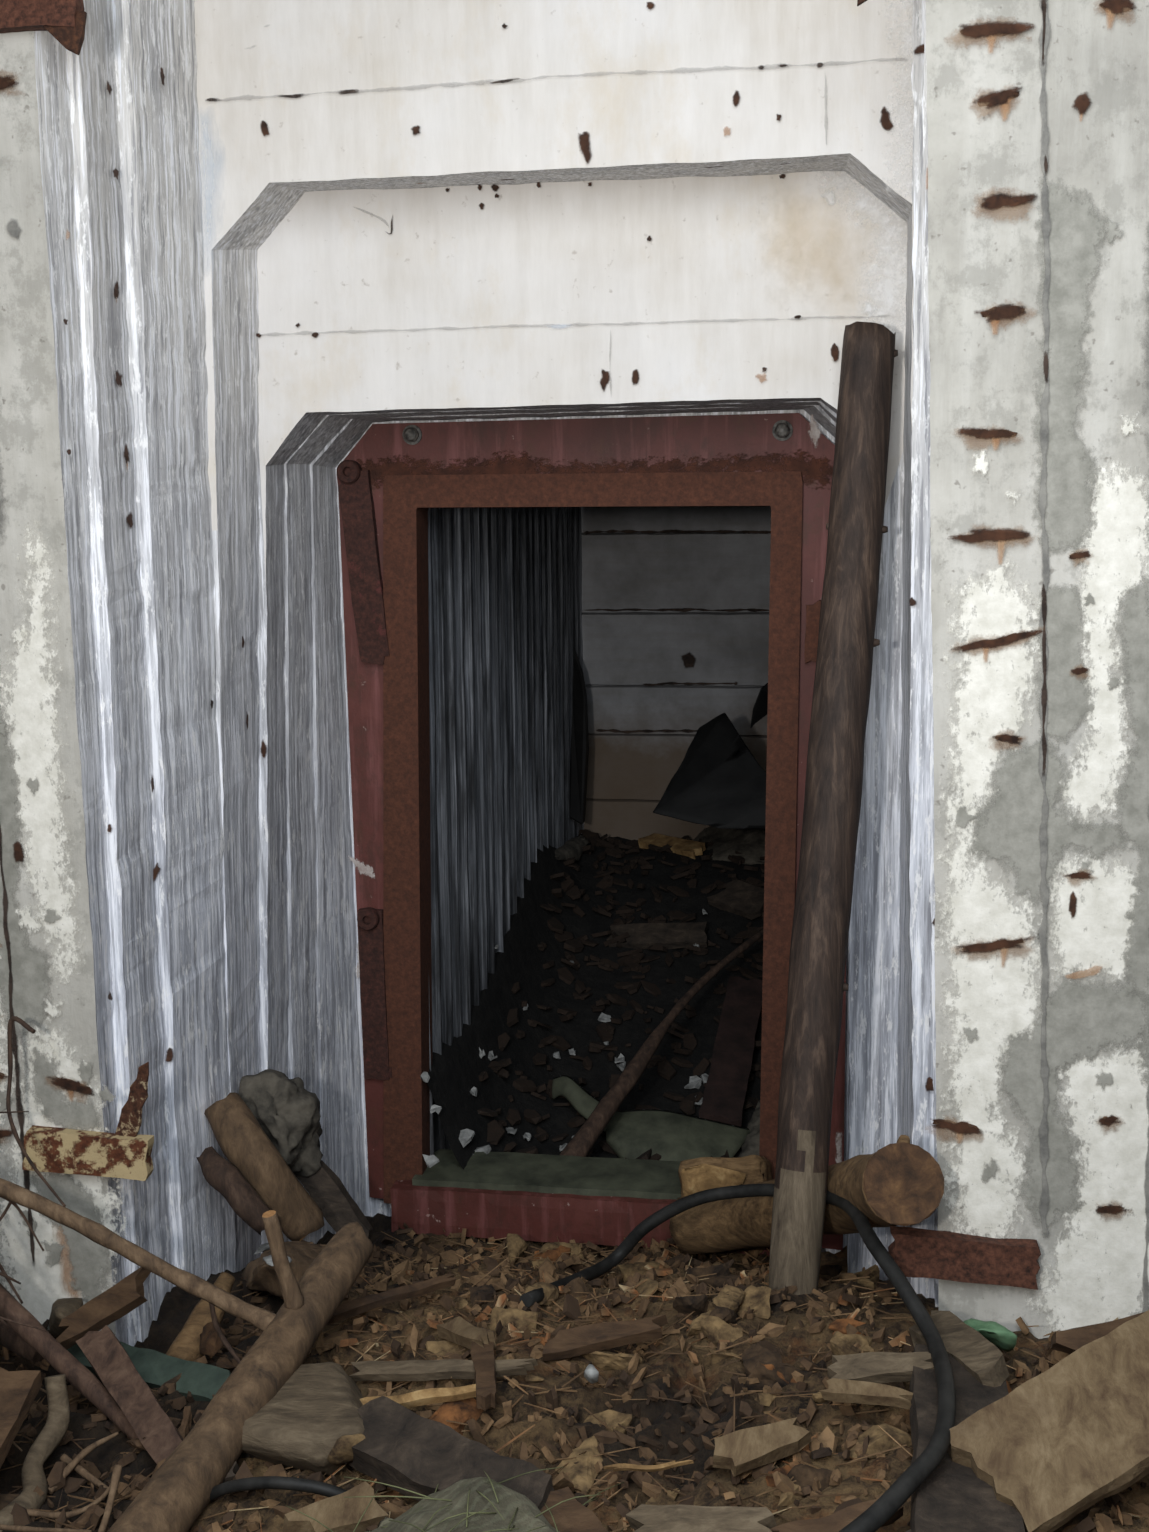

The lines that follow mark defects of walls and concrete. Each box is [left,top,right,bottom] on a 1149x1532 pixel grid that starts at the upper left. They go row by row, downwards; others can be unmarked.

leakage [7,220,20,238]
rust [357,449,834,490]
rust [115,1048,173,1137]